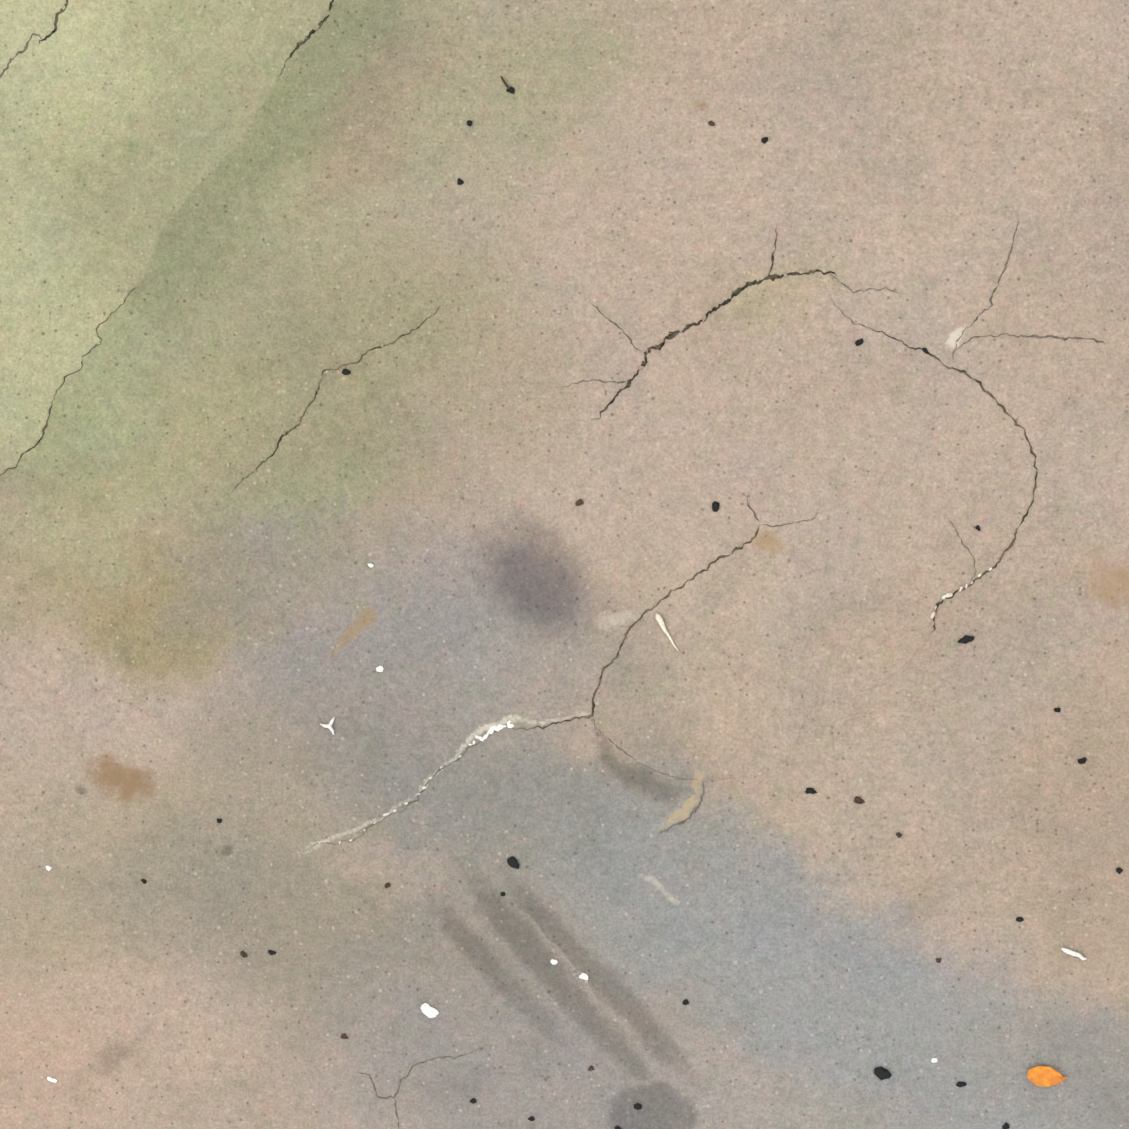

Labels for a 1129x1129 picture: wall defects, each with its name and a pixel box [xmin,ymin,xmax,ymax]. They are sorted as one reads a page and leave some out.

crack [0,0,68,77]
crack [276,0,334,81]
crack [0,281,137,475]
crack [230,308,439,494]
crack [565,218,1107,632]
leakage [432,481,644,677]
crack [311,495,818,847]
rust [67,739,177,817]
leakage [294,709,592,861]
leakage [417,840,718,1129]